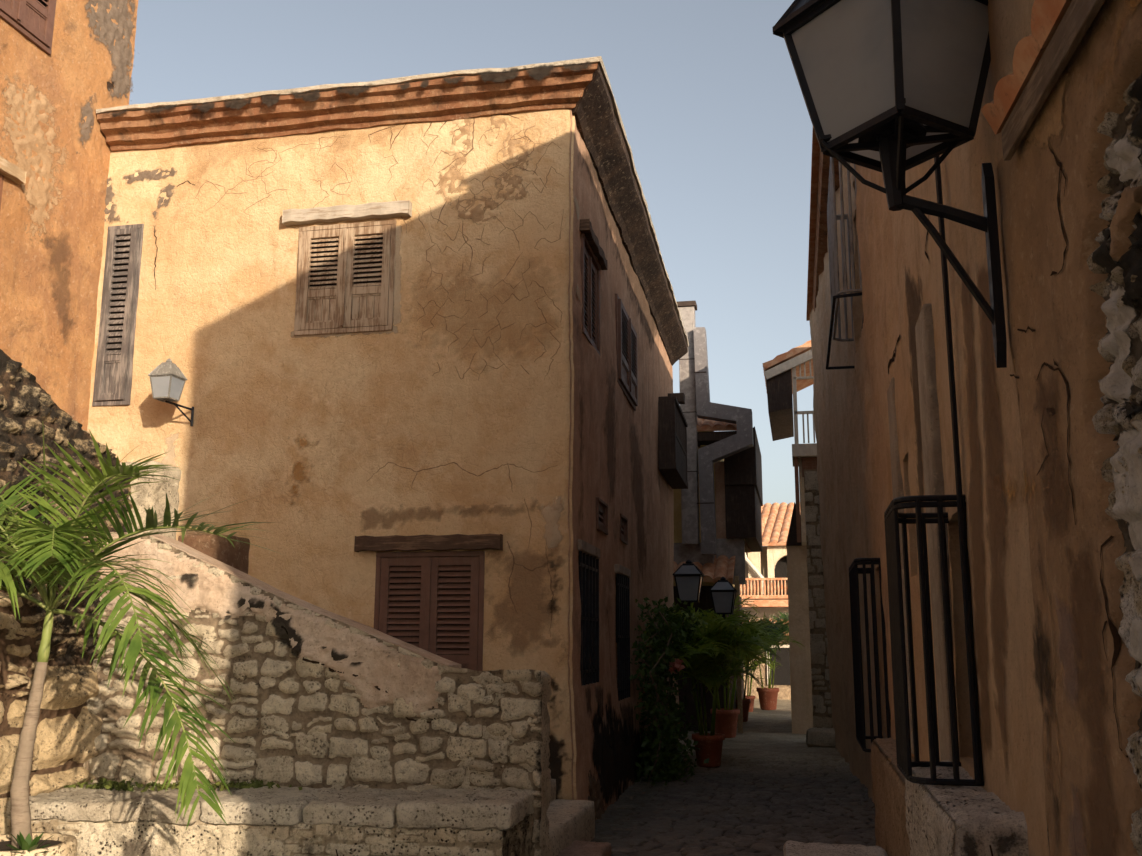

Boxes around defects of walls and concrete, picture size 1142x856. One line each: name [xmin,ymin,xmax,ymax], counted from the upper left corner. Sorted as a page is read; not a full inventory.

flaking render [85,0,135,98]
flaking render [104,168,177,222]
crack [151,225,159,289]
crack [177,114,564,381]
crack [1047,139,1067,276]
crack [1010,359,1076,525]
crack [1100,536,1128,757]